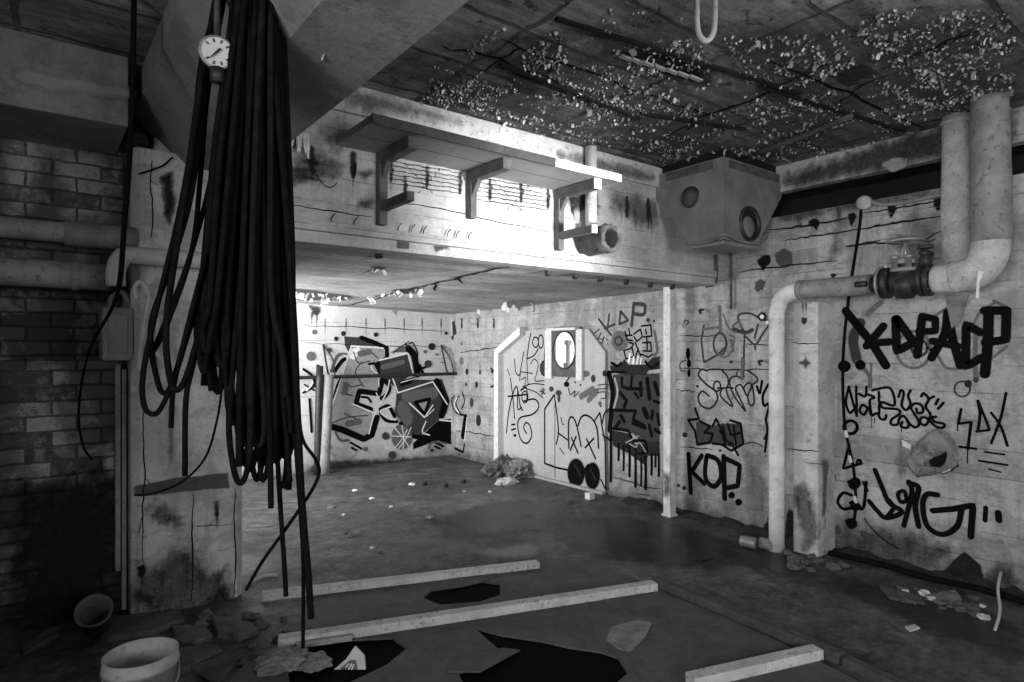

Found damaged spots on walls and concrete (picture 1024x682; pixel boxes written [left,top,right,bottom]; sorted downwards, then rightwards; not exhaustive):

peeling [420,8,1016,167]
crack [441,21,1009,152]
crack [150,160,158,237]
crack [191,488,237,601]